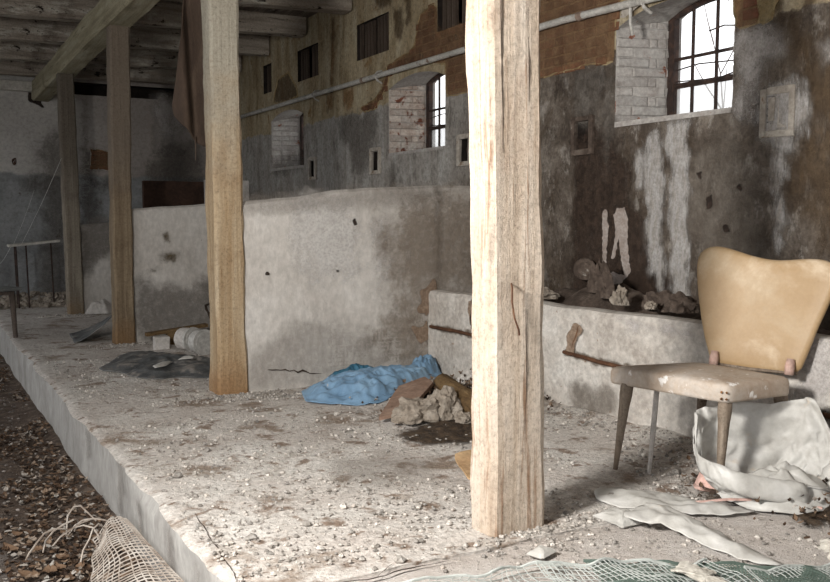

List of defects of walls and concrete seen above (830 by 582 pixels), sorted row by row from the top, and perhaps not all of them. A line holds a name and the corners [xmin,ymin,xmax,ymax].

flaking render [360,3,468,113]
flaking render [539,0,624,79]
flaking render [728,0,762,29]
flaking render [90,148,108,171]
damp [735,27,830,252]
crack [268,367,319,375]